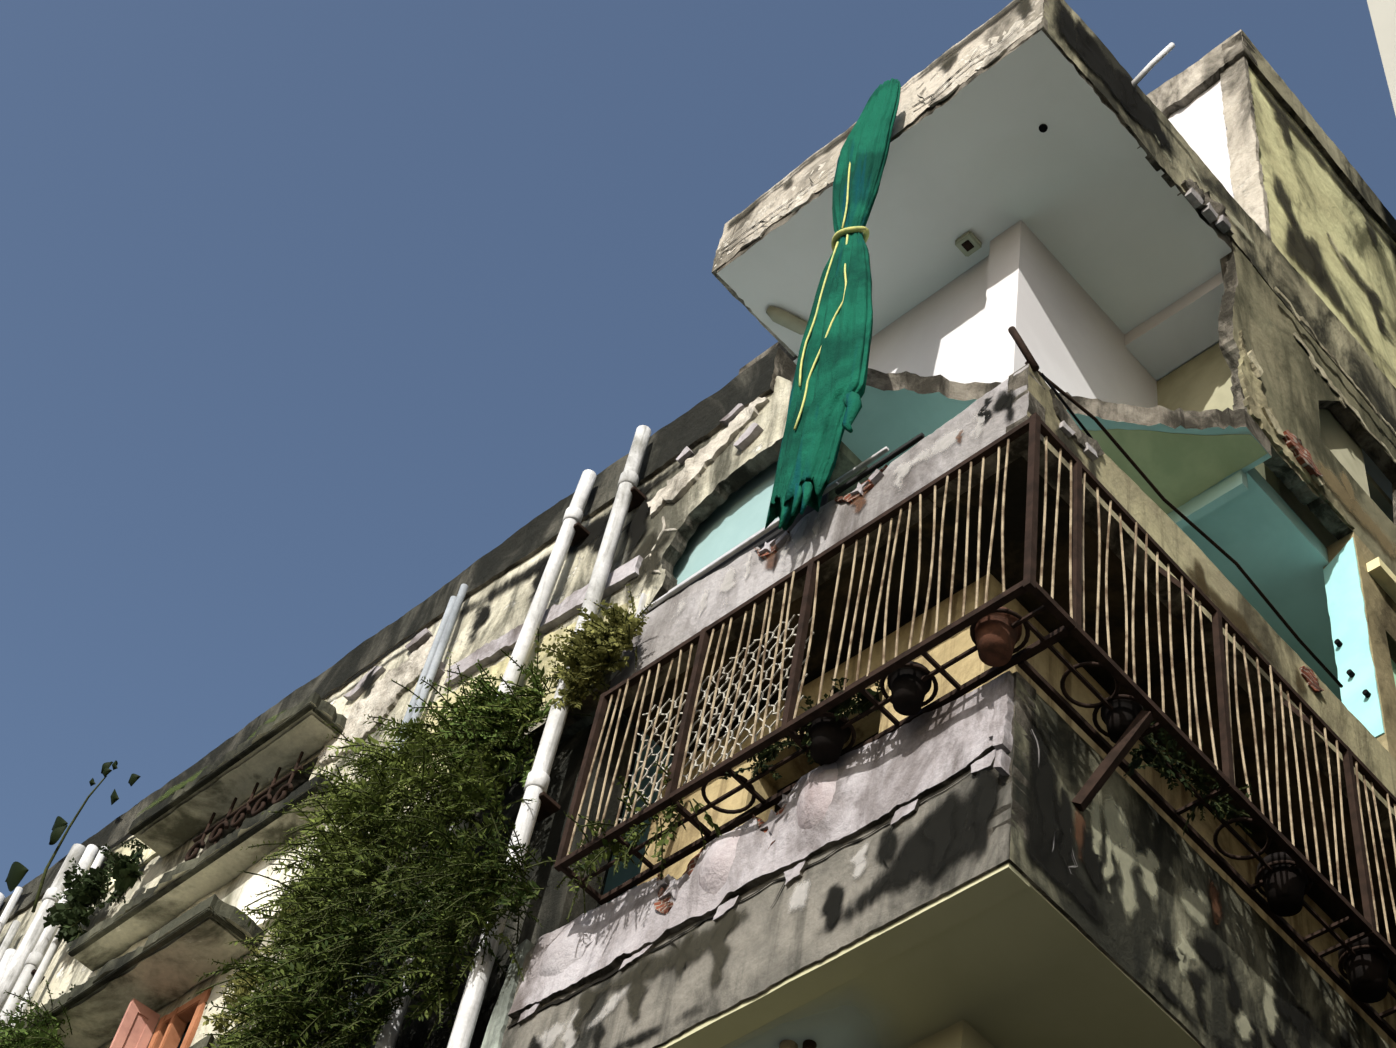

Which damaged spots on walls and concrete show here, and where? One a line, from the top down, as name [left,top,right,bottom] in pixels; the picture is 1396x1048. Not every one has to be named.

leakage [901,0,1032,89]
leakage [1057,0,1174,161]
mould [1256,78,1396,254]
mould [1273,175,1394,365]
peeling [647,397,770,517]
spalling [756,531,791,560]
leakage [1187,559,1262,648]
flaking render [508,671,1014,1025]
leakage [821,769,998,929]
leakage [1025,710,1159,922]
leakage [528,907,746,1048]
leakage [1148,890,1319,1048]